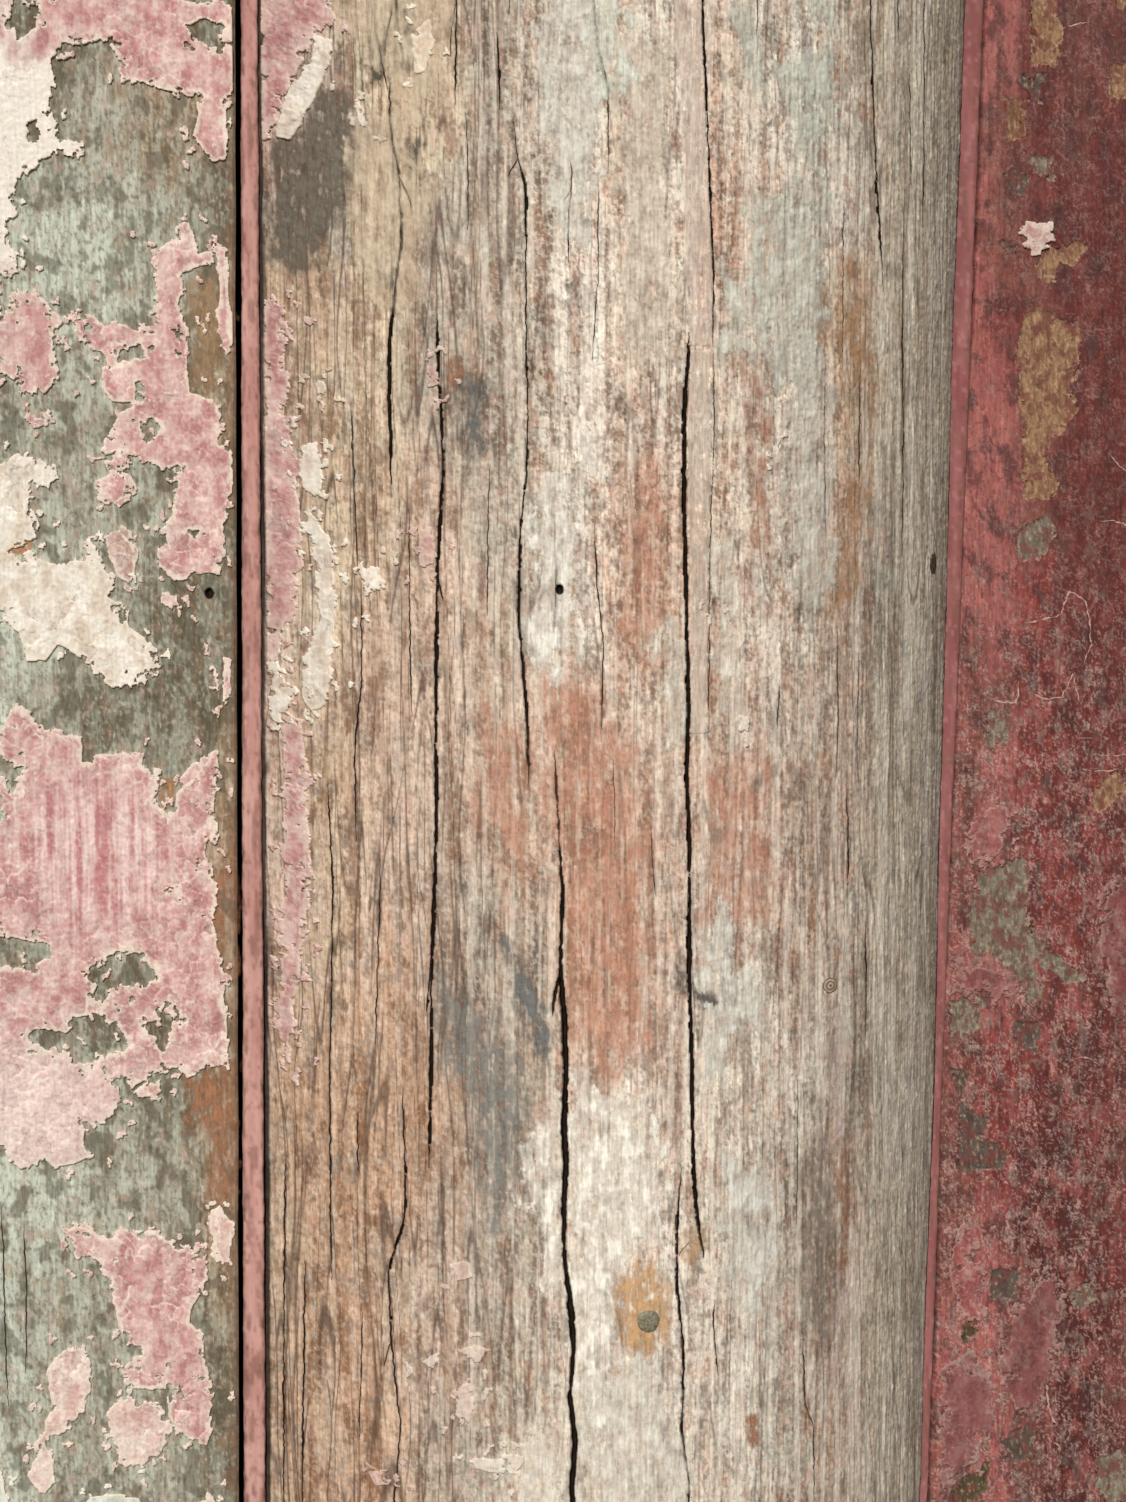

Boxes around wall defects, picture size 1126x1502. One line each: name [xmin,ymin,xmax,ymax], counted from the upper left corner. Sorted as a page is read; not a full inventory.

peeling [0,0,234,688]
peeling [260,0,348,140]
crack [564,0,609,358]
peeling [1000,221,1088,284]
peeling [1013,307,1082,562]
peeling [263,289,455,1086]
crack [450,0,578,1502]
crack [594,524,616,852]
crack [651,0,718,1502]
peeling [0,703,234,1181]
peeling [0,1201,235,1502]
rust [613,1262,668,1354]